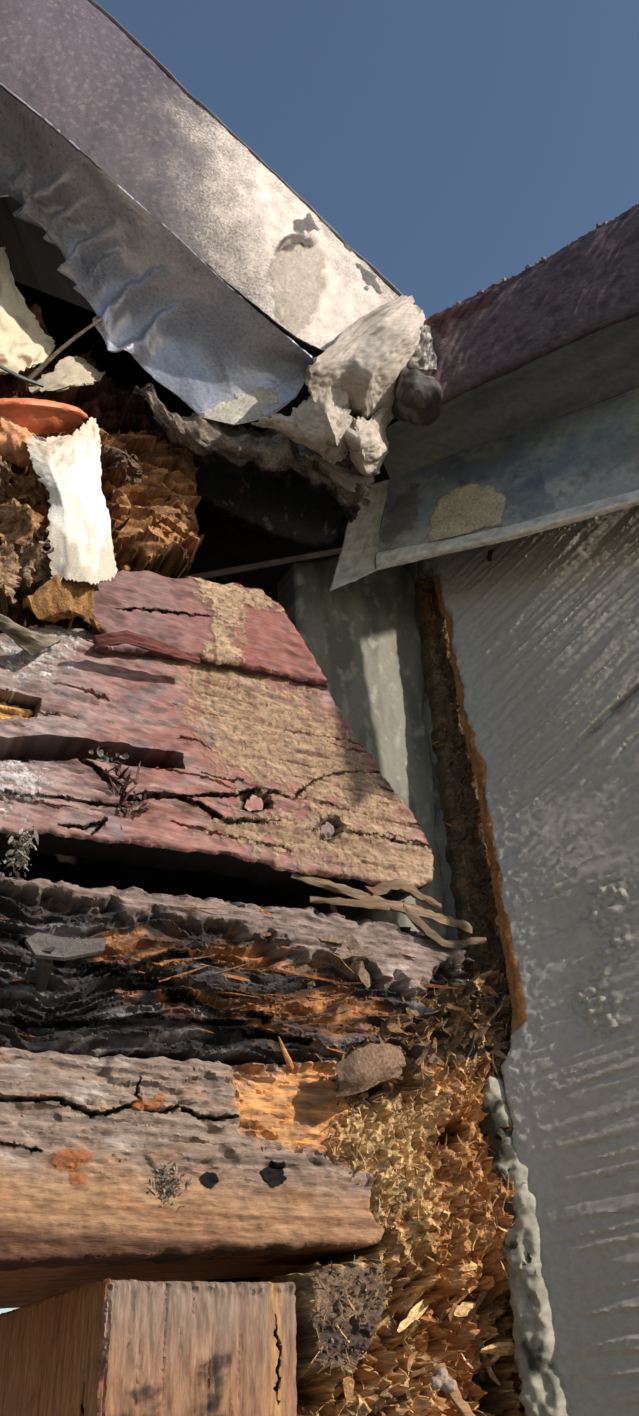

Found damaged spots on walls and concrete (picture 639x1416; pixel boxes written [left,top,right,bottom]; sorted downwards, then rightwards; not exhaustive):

peeling [294,213,320,237]
peeling [0,582,42,617]
crack [117,607,217,618]
crack [4,759,425,848]
peeling [294,575,545,1416]
crack [0,1079,235,1122]
crack [0,1143,40,1152]
damp [195,1355,231,1416]